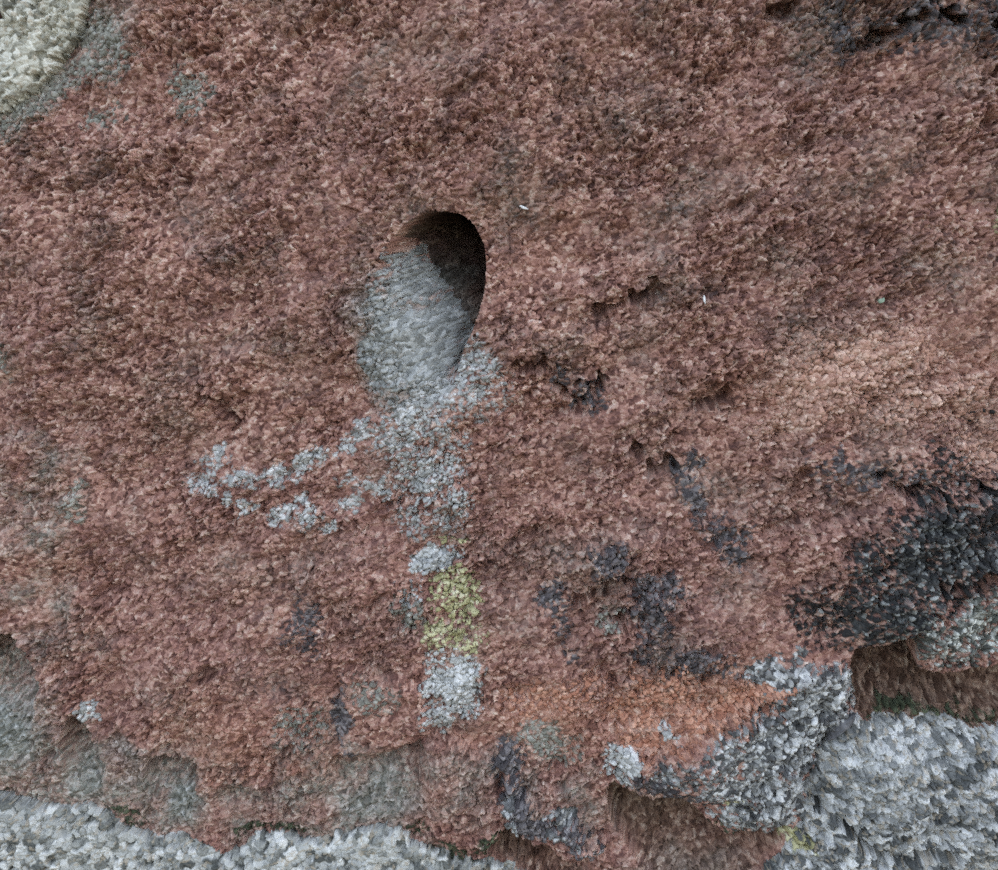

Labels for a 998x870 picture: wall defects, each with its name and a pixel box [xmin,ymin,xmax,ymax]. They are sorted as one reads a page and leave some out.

spalling [400,211,488,331]
spalling [825,633,998,741]
spalling [605,781,792,870]